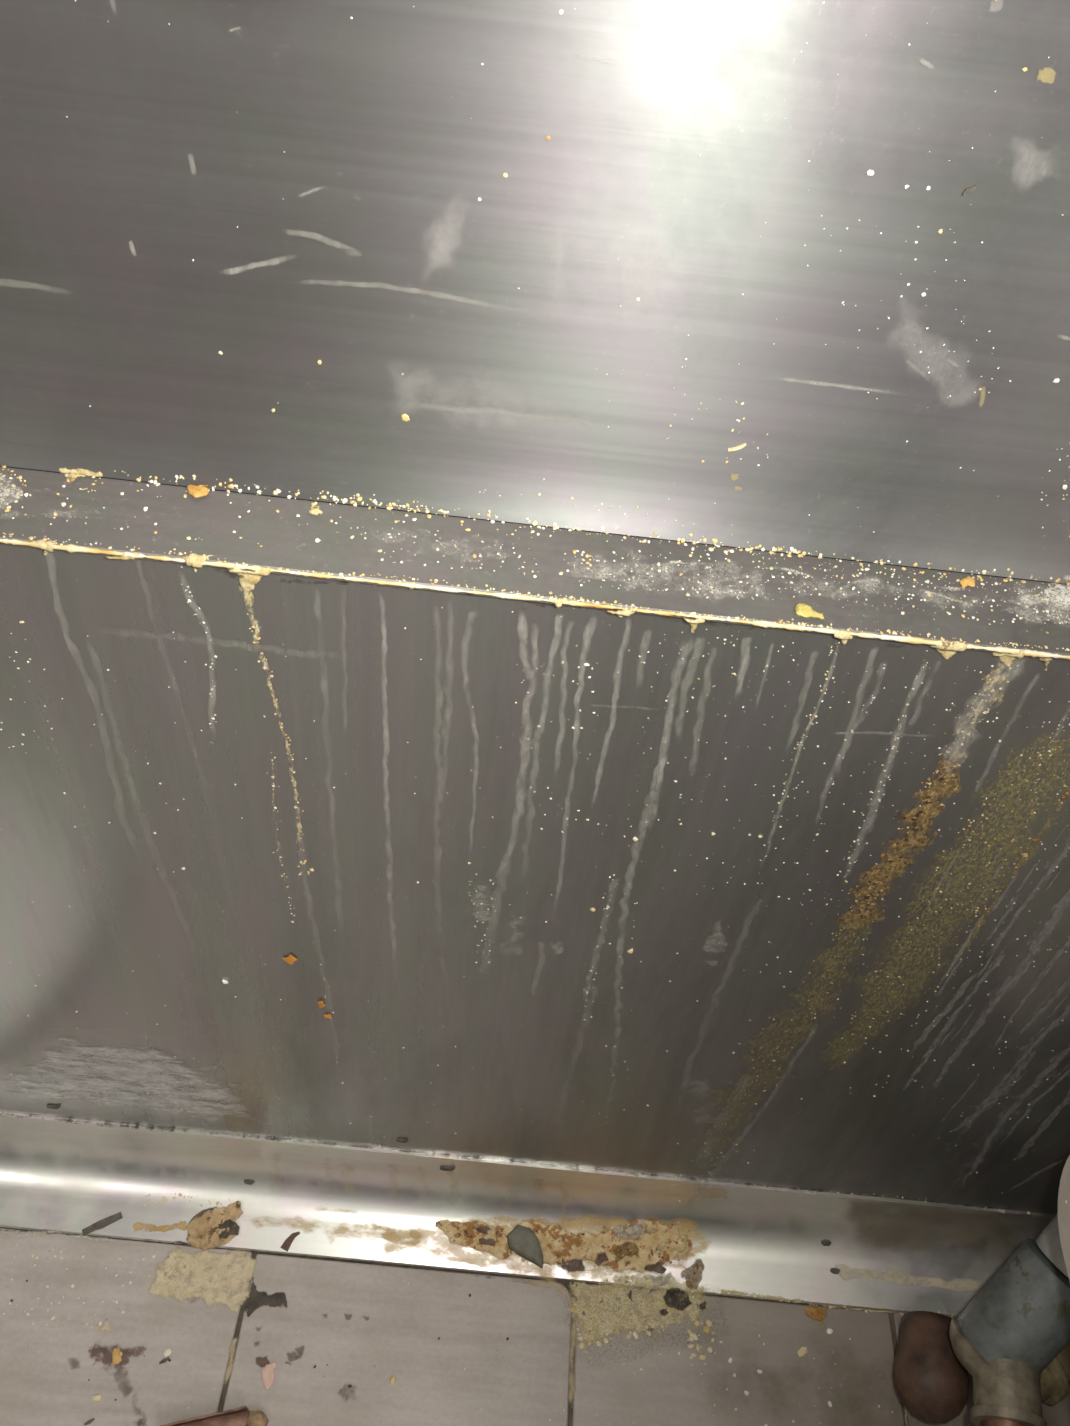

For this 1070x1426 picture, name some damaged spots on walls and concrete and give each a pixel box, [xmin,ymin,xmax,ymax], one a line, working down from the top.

corrosion [671,647,1020,1202]
water stain [908,890,1070,1169]